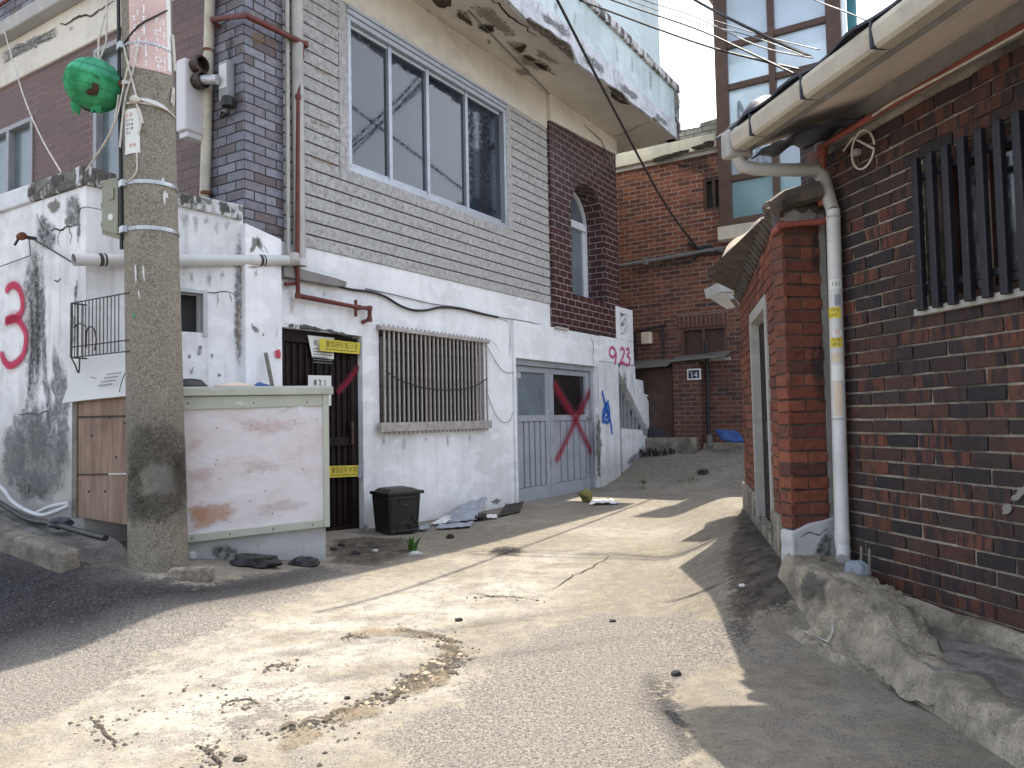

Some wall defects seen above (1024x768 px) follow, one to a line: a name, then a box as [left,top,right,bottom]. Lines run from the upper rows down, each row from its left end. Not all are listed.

crack [60,1,113,30]
peeling [427,0,603,76]
spalling [608,84,637,105]
peeling [653,95,682,134]
damp [66,196,80,236]
damp [3,216,69,498]
corrosion [191,505,229,528]
crack [466,555,609,603]